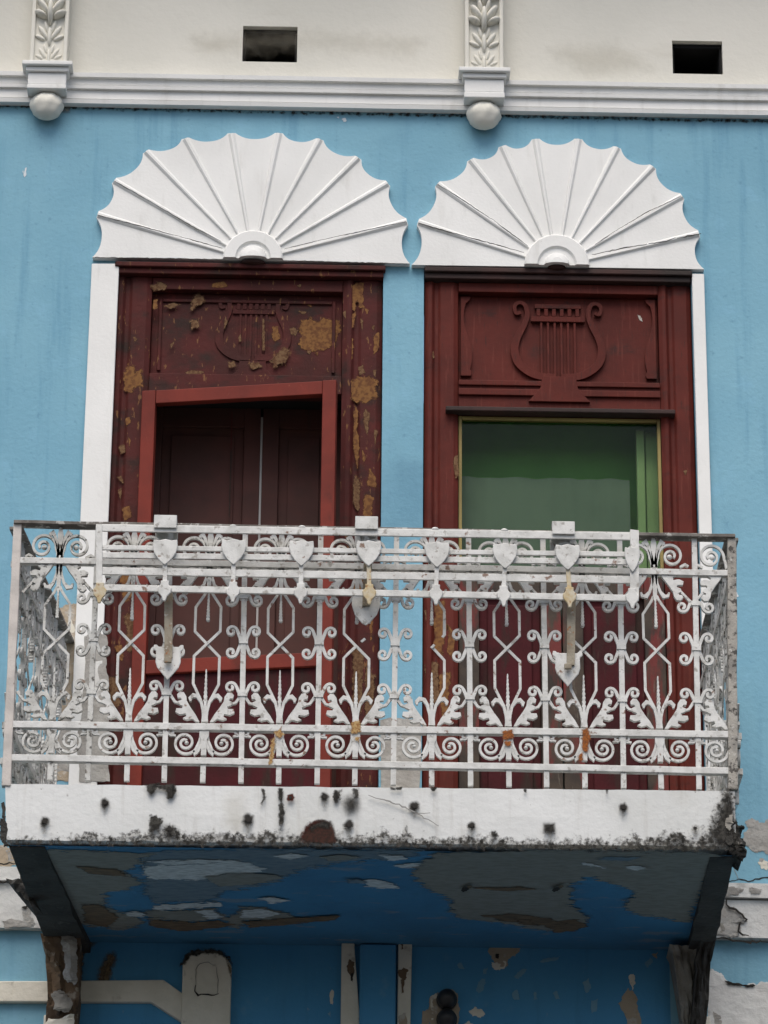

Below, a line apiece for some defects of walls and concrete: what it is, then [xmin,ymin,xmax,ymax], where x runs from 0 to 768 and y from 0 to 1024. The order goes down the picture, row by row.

peeling [228,282,380,370]
corrosion [269,729,285,765]
corrosion [351,720,361,742]
corrosion [503,729,514,746]
corrosion [578,728,590,761]
leakage [145,783,176,799]
leakage [7,787,740,851]
spalling [0,802,43,929]
peeling [47,849,340,931]
peeling [377,814,768,938]
spalling [46,936,78,1024]
peeling [708,969,768,1024]